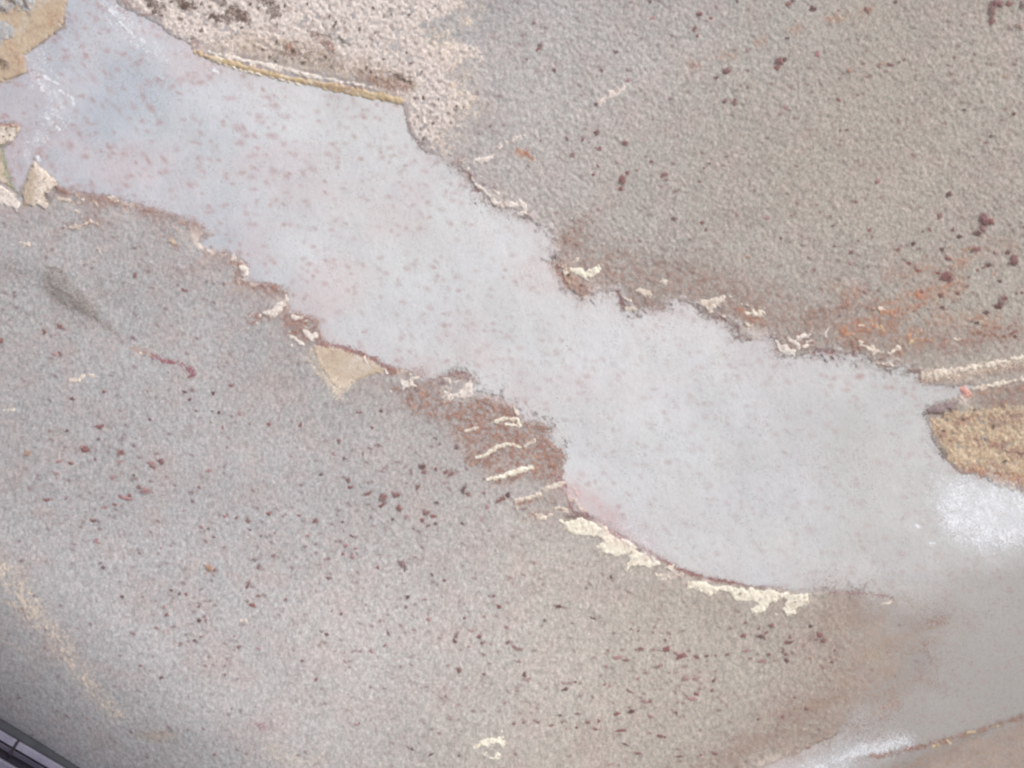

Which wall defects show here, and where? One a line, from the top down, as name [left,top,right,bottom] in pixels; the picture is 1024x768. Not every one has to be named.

peeling [0,0,68,83]
spalling [122,0,534,223]
peeling [0,123,209,255]
spalling [219,248,327,350]
spalling [386,361,478,404]
spalling [548,254,601,306]
spalling [620,277,766,331]
spalling [773,328,829,357]
corrosion [392,378,567,523]
spalling [928,389,1024,493]
corrosion [346,478,438,532]
spalling [519,488,811,616]